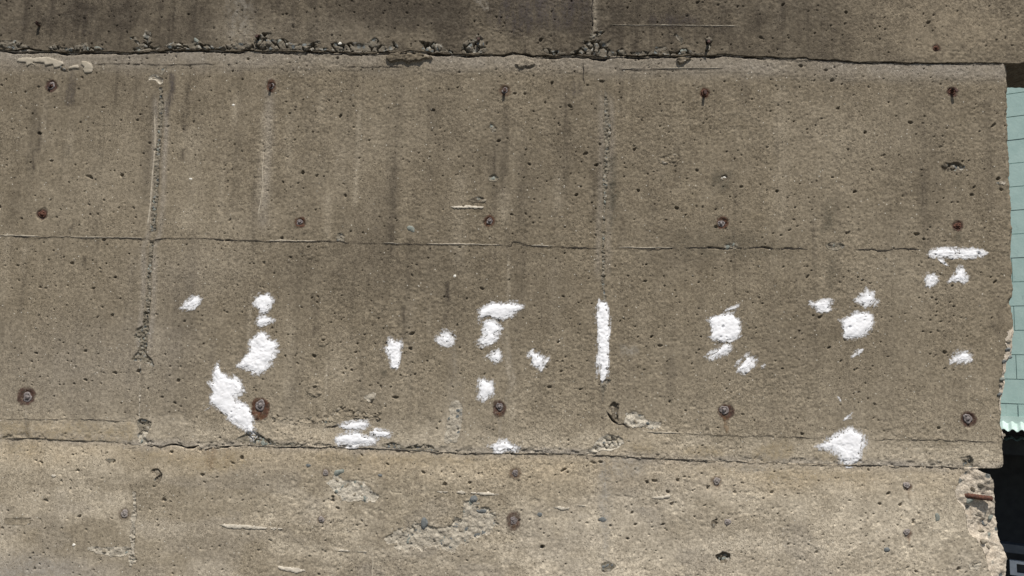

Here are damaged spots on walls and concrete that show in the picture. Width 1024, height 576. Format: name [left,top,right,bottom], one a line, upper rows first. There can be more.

crack [0,0,1002,84]
rust [17,388,35,405]
crack [0,418,121,442]
rust [251,398,269,420]
crack [132,424,966,470]
spalling [955,455,1007,576]